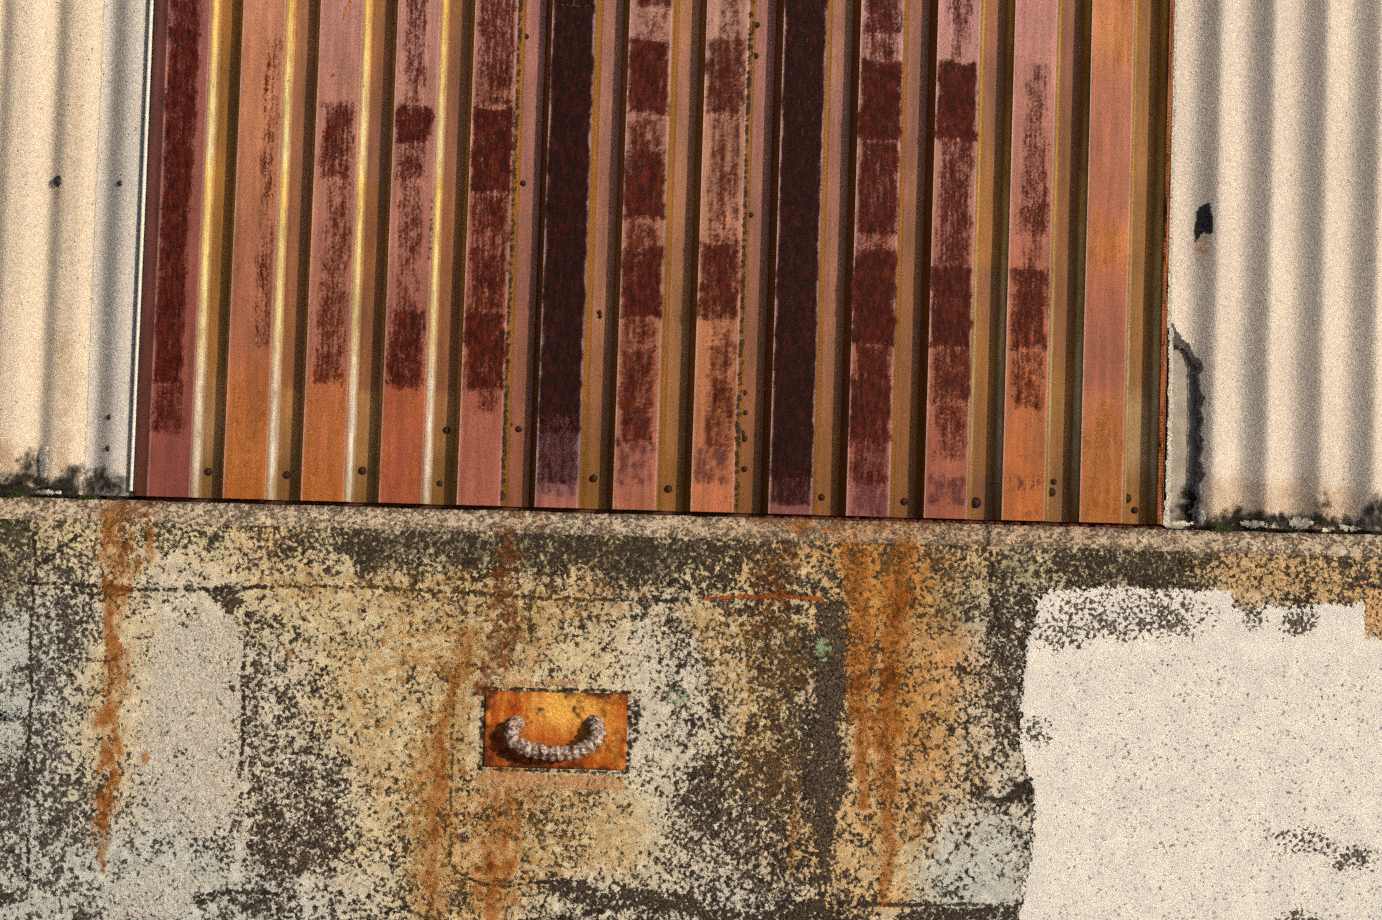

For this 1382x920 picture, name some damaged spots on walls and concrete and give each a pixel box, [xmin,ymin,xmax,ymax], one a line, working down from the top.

damp [0,452,128,500]
rust [149,0,202,434]
rust [463,0,517,414]
rust [538,0,596,496]
rust [617,0,672,484]
rust [770,0,828,506]
rust [848,0,903,518]
rust [929,0,979,459]
peeling [1163,0,1207,528]
peeling [1017,554,1382,920]
spalling [1194,203,1213,253]
damp [1172,488,1382,535]